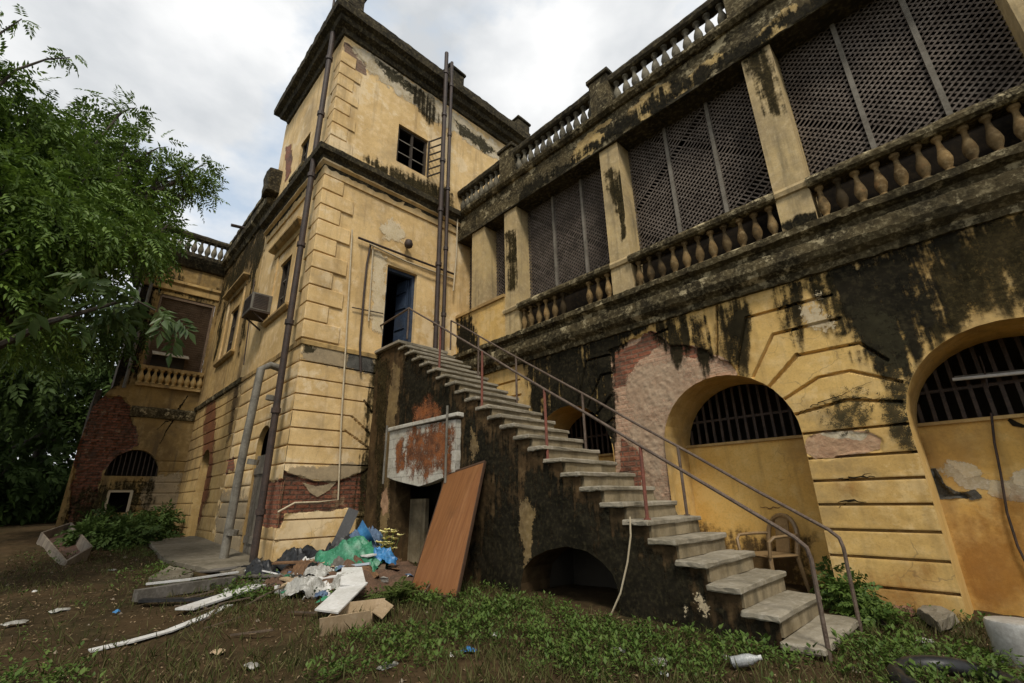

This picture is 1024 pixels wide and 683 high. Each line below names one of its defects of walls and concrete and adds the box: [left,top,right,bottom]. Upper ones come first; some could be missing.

damp [351,45,502,160]
damp [519,0,828,201]
flaking render [285,144,293,181]
damp [773,211,1024,453]
flaking render [67,395,139,522]
crack [157,395,188,443]
flaking render [263,470,365,528]
rust [395,396,454,484]
damp [353,355,780,652]
flaking render [611,331,737,500]
flaking render [805,430,881,459]
peeling [930,459,1024,502]